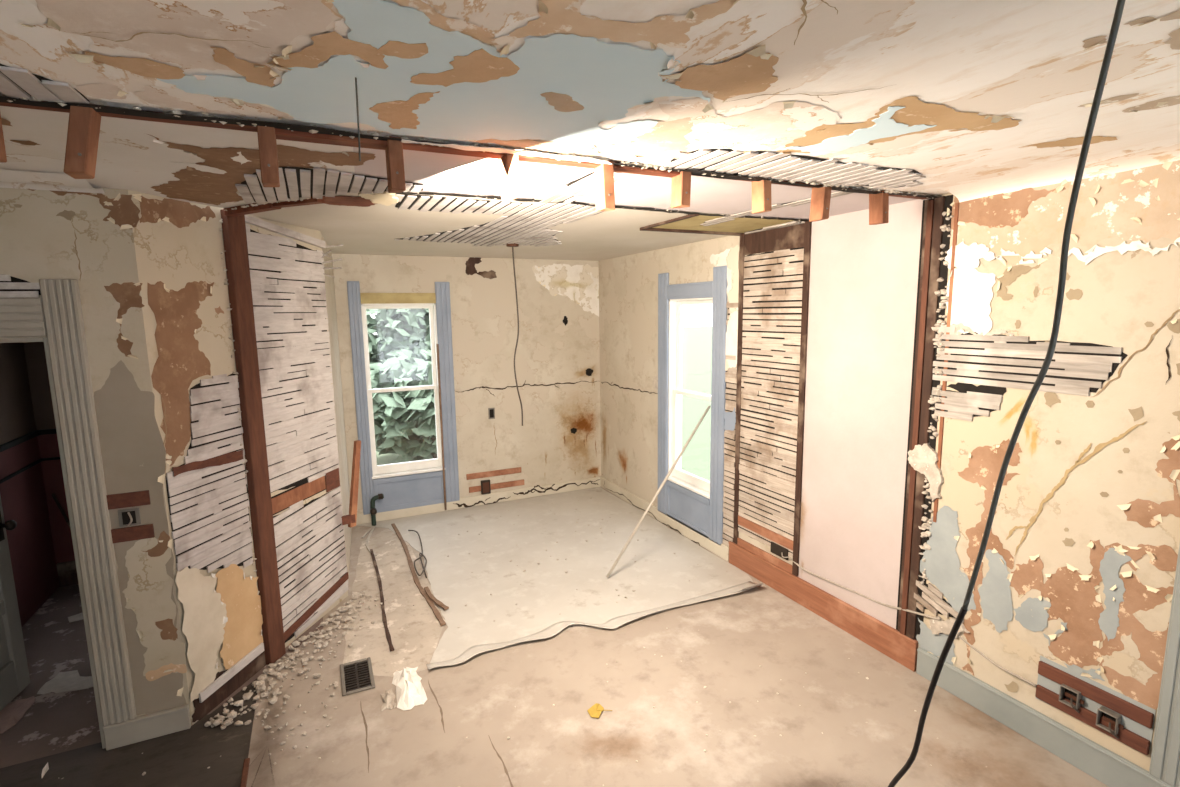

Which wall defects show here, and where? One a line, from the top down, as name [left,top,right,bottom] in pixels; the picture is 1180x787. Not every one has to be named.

crack [794,0,838,45]
peeling [1123,10,1180,50]
peeling [21,0,1022,155]
peeling [1078,93,1180,113]
peeling [49,134,260,230]
peeling [277,145,376,168]
flaking render [322,196,375,207]
flaking render [933,380,1006,395]
peeling [1100,411,1180,528]
peeling [94,281,266,722]
peeling [916,439,1178,710]
crack [488,735,513,787]